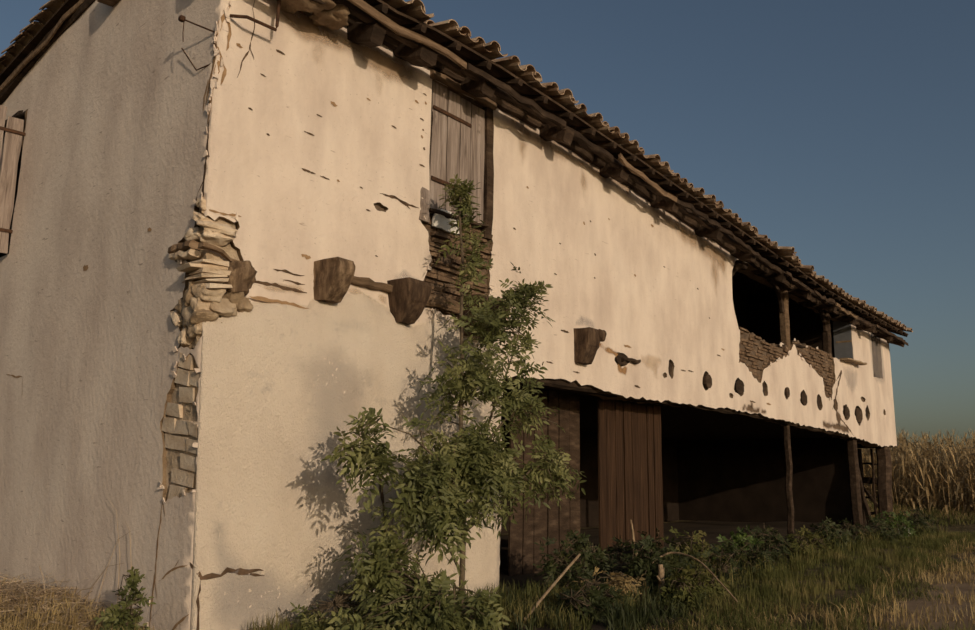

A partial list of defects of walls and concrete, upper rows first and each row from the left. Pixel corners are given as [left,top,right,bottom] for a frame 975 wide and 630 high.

spalling [157,197,257,502]
spalling [739,327,835,400]
crack [146,501,264,630]